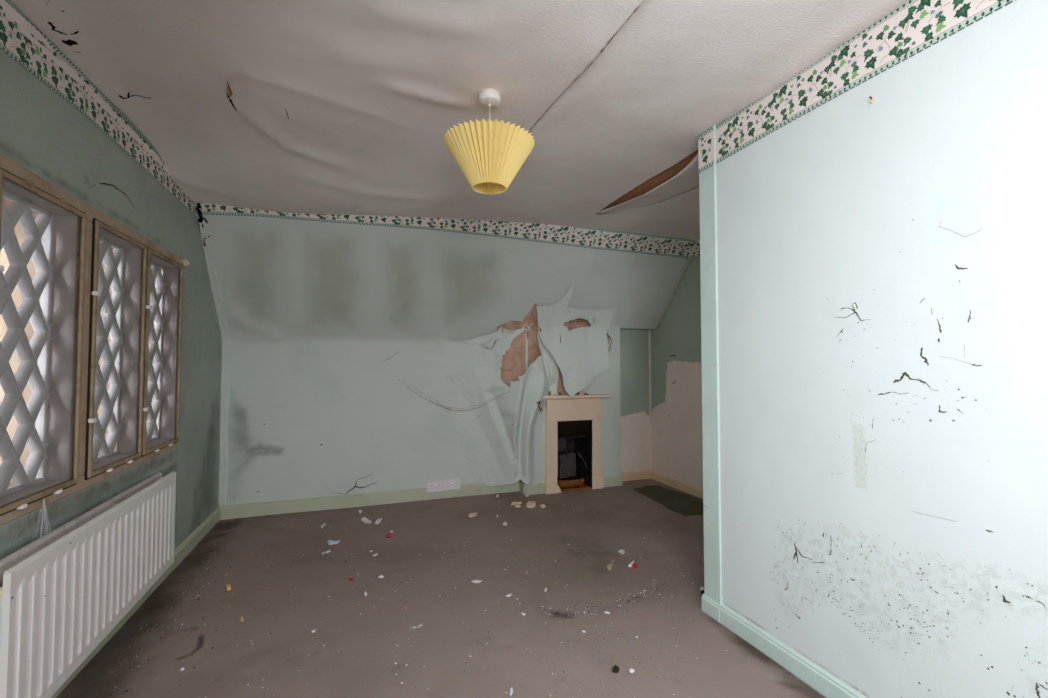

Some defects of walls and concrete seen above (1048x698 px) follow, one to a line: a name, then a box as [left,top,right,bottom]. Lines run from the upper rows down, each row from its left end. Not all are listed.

flaking render [497,304,543,388]
flaking render [554,363,569,395]
flaking render [564,318,590,331]
flaking render [621,360,703,489]
water stain [770,520,1047,655]
water stain [740,641,776,662]